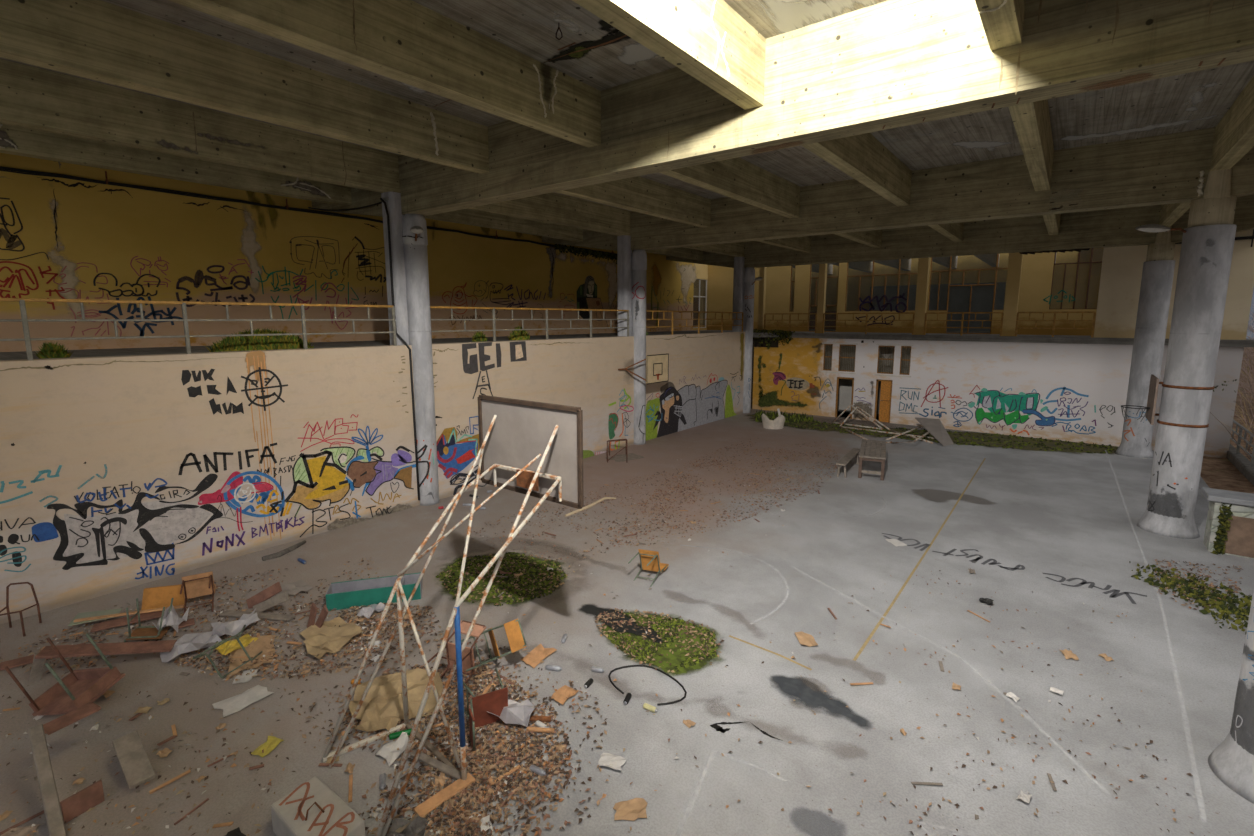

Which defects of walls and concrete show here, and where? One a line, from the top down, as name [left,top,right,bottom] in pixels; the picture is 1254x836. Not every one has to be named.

rust [246,351,281,541]